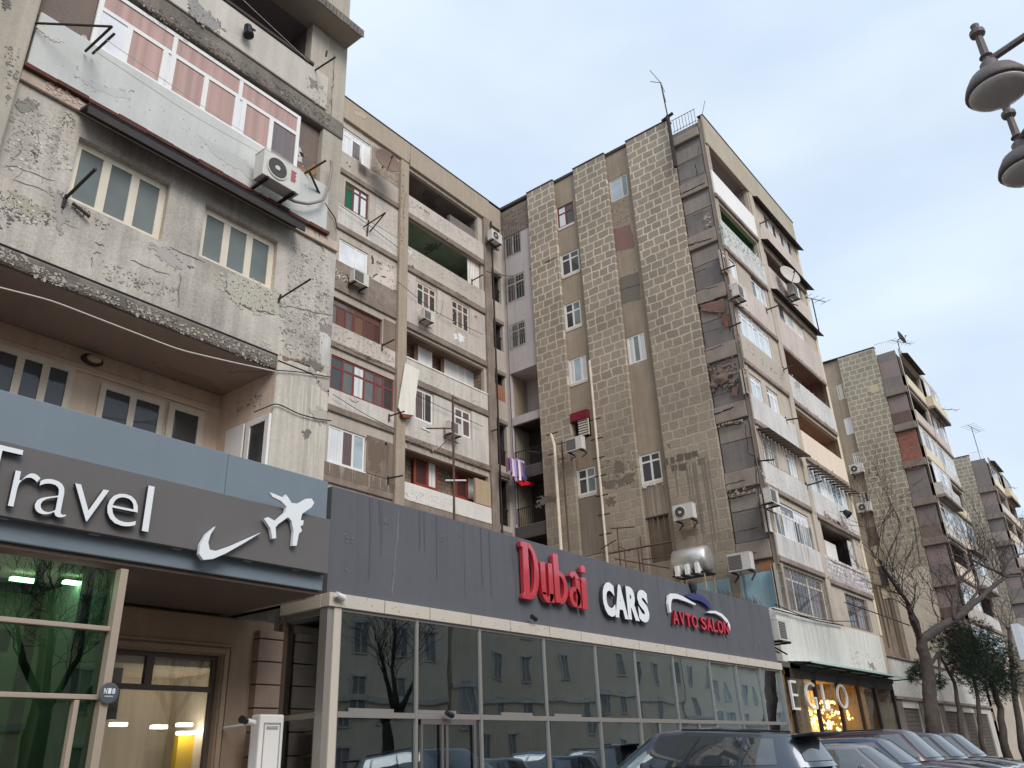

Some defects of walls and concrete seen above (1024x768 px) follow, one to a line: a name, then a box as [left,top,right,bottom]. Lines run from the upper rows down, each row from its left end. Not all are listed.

peeling [142,0,330,127]
spalling [0,190,51,229]
peeling [0,247,350,368]
spalling [705,349,739,399]